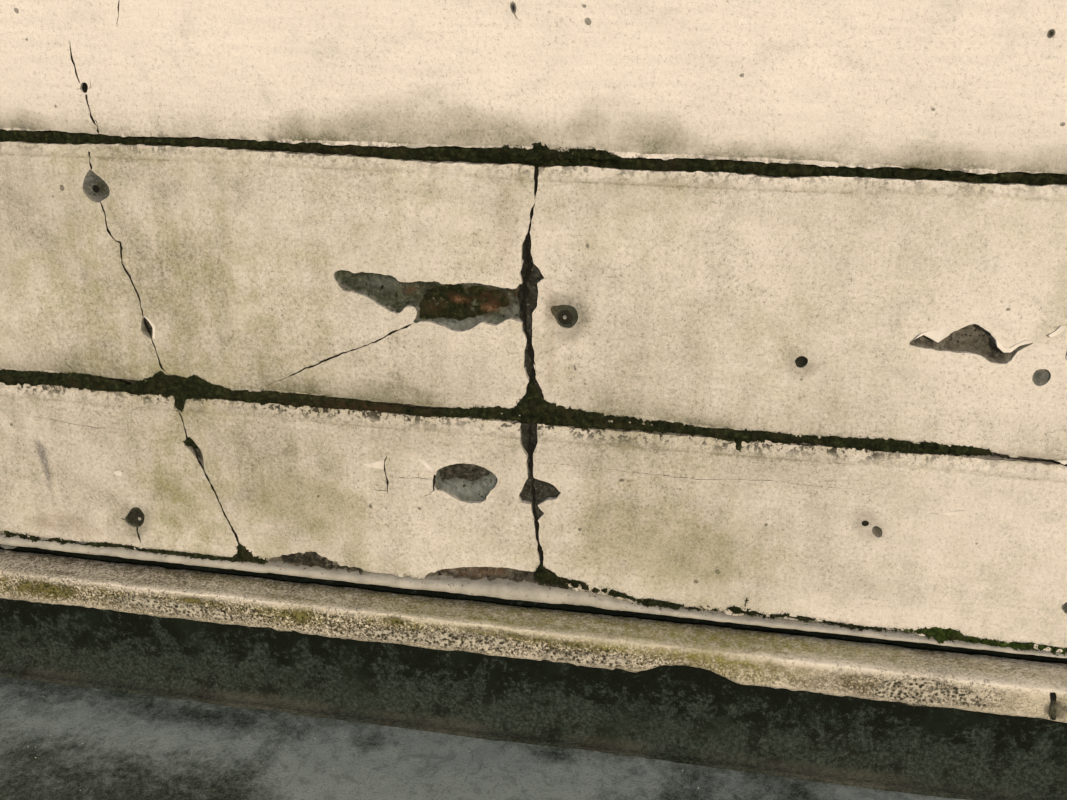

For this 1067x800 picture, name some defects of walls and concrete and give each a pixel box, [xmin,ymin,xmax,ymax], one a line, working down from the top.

crack [70,47,99,169]
spalling [83,169,110,202]
crack [100,201,169,375]
spalling [335,270,529,331]
crack [268,324,412,386]
crack [519,168,853,589]
spalling [909,324,1067,363]
crack [179,413,240,544]
spalling [433,463,497,502]